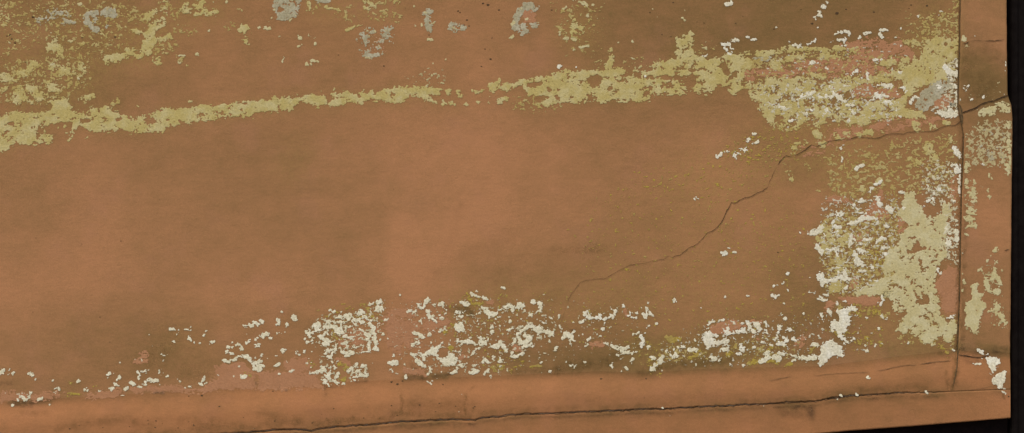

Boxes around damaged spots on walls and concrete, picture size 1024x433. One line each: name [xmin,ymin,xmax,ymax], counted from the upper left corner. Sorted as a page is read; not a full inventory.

flaking render [509,1,540,39]
peeling [550,0,605,58]
peeling [0,0,470,153]
peeling [964,99,1012,176]
crack [241,0,1008,433]
peeling [963,178,978,229]
peeling [964,247,1008,335]
peeling [225,331,273,355]
peeling [973,348,1010,397]